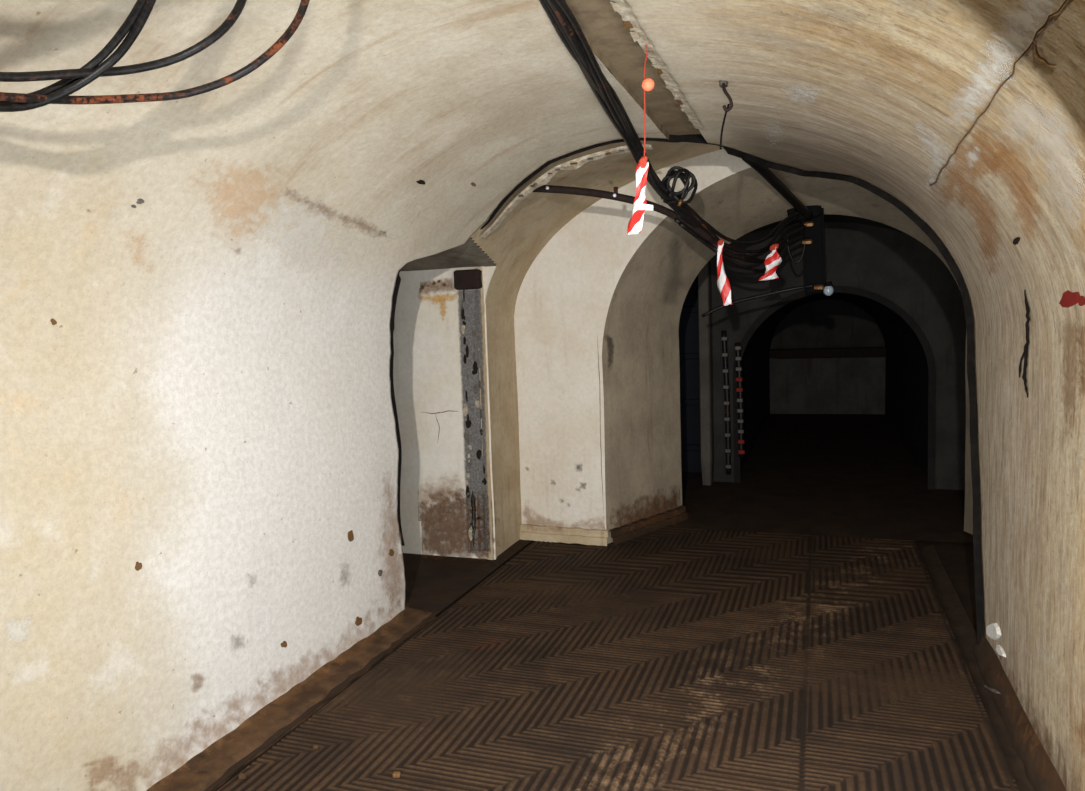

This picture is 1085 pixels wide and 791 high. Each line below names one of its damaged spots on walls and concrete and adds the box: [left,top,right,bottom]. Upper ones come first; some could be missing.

crack [930,0,1067,186]
water stain [420,489,494,560]